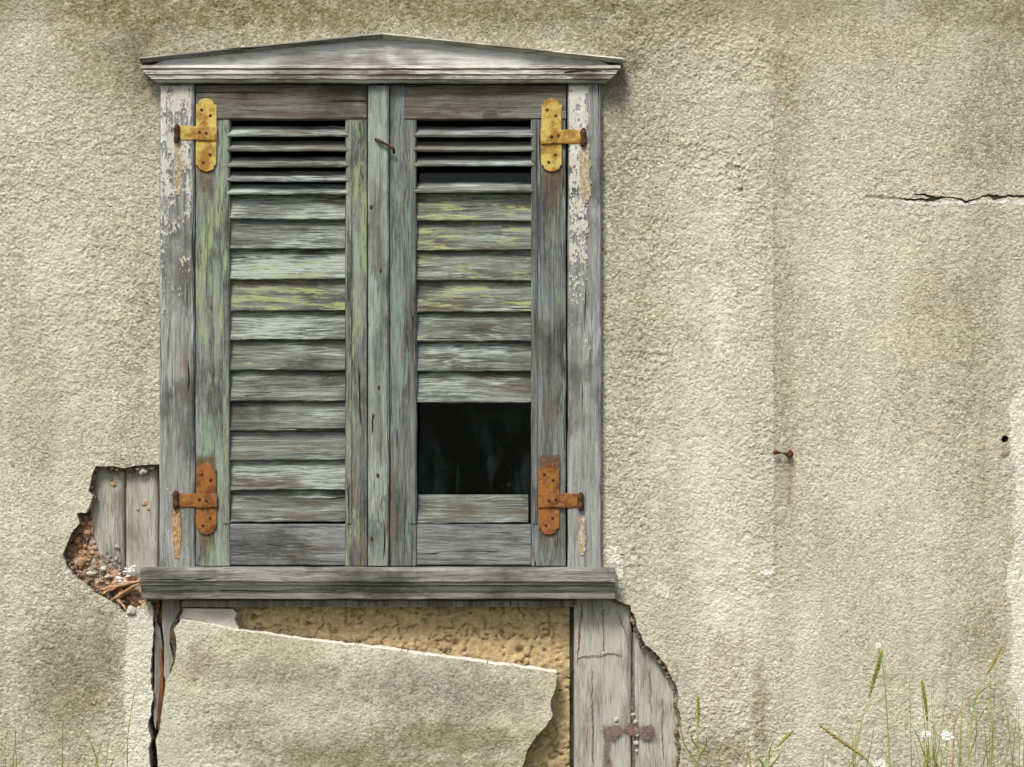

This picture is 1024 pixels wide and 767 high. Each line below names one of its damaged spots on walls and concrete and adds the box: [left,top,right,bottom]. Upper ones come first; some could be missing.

peeling [161,86,191,315]
peeling [569,86,591,308]
crack [865,193,1024,207]
flaking render [63,464,172,767]
crack [148,599,183,767]
flaking render [175,545,755,767]